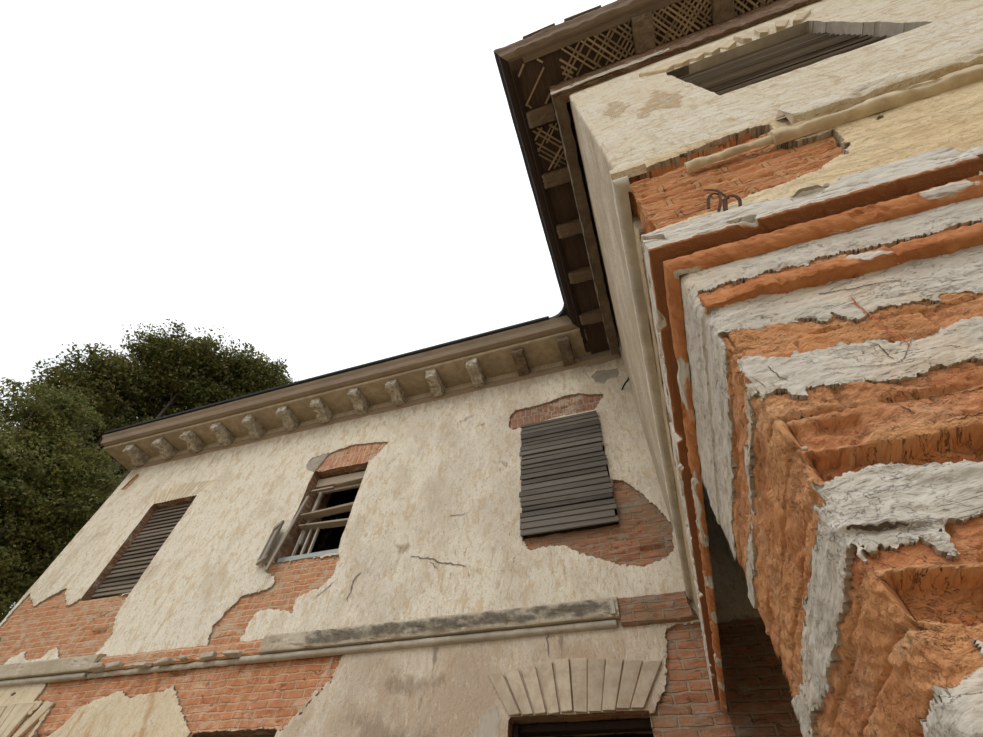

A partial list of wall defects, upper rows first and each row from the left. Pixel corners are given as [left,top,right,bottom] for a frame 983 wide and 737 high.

spalling [628,124,851,466]
spalling [697,220,983,307]
spalling [508,368,619,430]
spalling [306,441,388,472]
crack [411,556,465,567]
spalling [522,479,674,567]
spalling [650,291,983,737]
spalling [0,554,342,737]